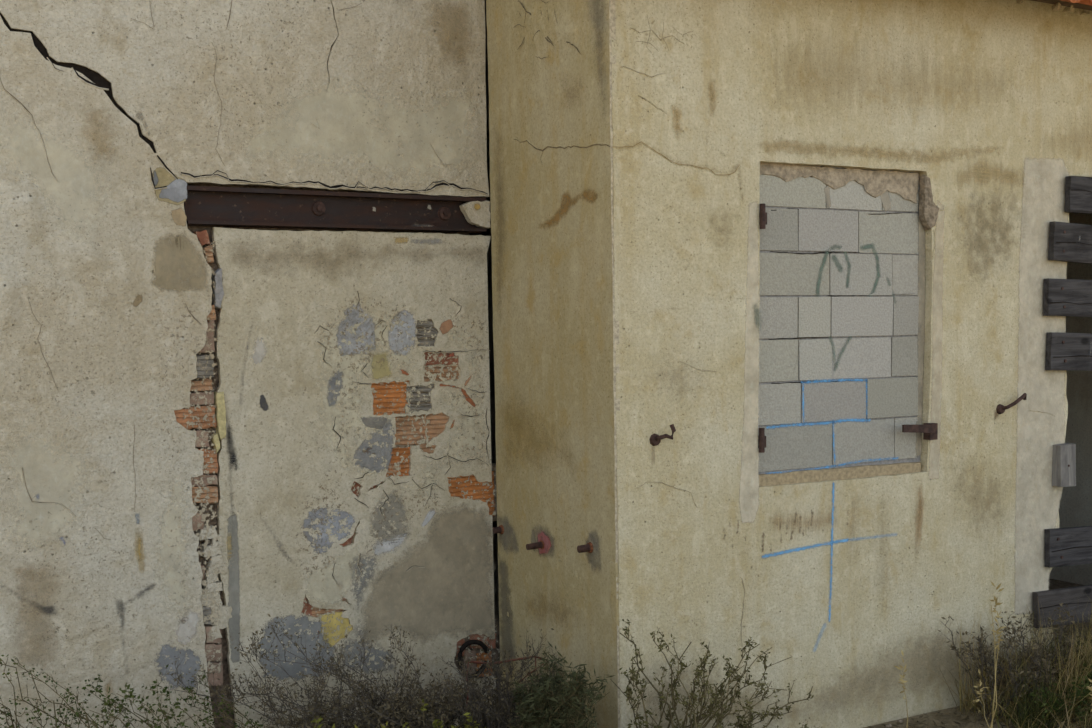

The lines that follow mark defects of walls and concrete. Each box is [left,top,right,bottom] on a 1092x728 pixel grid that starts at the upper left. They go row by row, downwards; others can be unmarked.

crack [0,0,488,198]
crack [623,16,693,114]
crack [514,138,741,176]
flaking render [149,167,234,728]
flaking render [324,301,485,496]
flaking render [447,463,497,521]
flaking render [301,583,353,647]